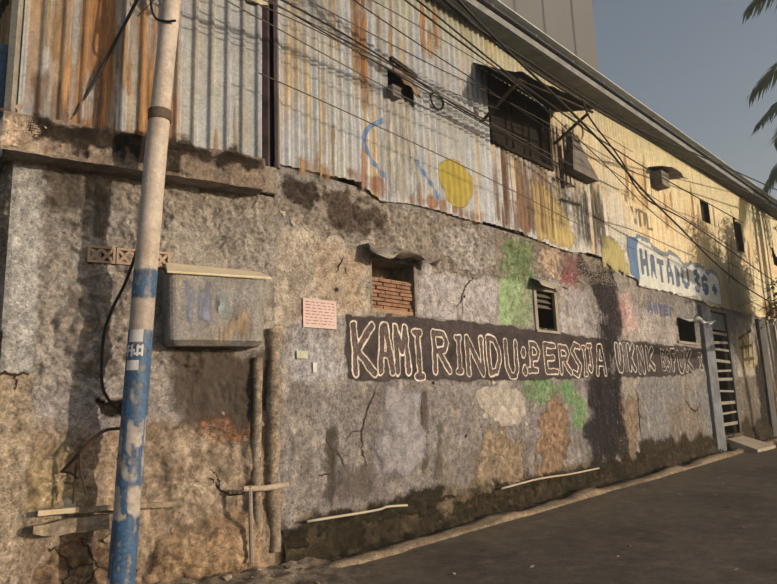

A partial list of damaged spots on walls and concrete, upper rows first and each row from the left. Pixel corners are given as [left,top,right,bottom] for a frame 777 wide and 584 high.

corrosion [33,0,157,134]
corrosion [350,0,372,108]
water stain [27,113,147,164]
water stain [166,134,263,173]
crack [48,538,108,584]